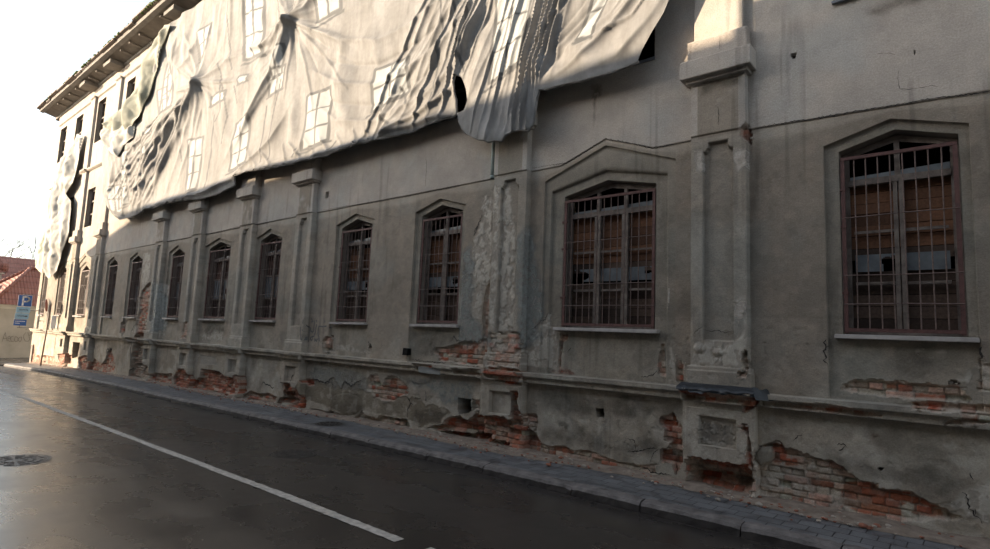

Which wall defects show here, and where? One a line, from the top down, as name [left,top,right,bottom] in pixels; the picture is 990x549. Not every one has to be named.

spalling [29,345,115,373]
spalling [119,251,340,415]
spalling [322,182,990,528]